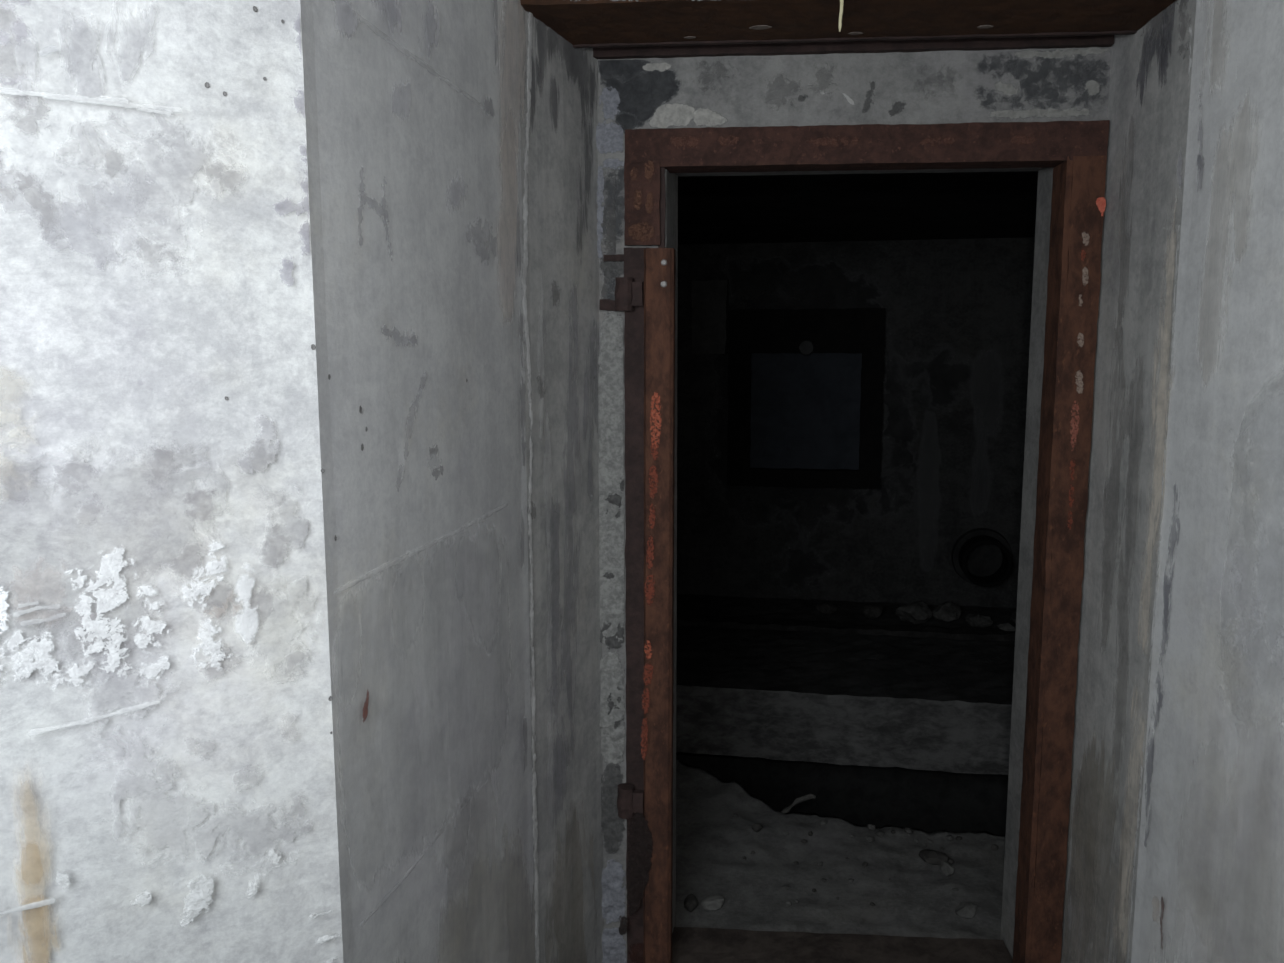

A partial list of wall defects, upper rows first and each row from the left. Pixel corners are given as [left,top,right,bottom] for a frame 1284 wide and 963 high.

peeling [0,547,170,687]
peeling [182,540,258,669]
damp [1186,377,1284,963]
corrosion [18,783,57,963]
corrosion [618,812,653,963]